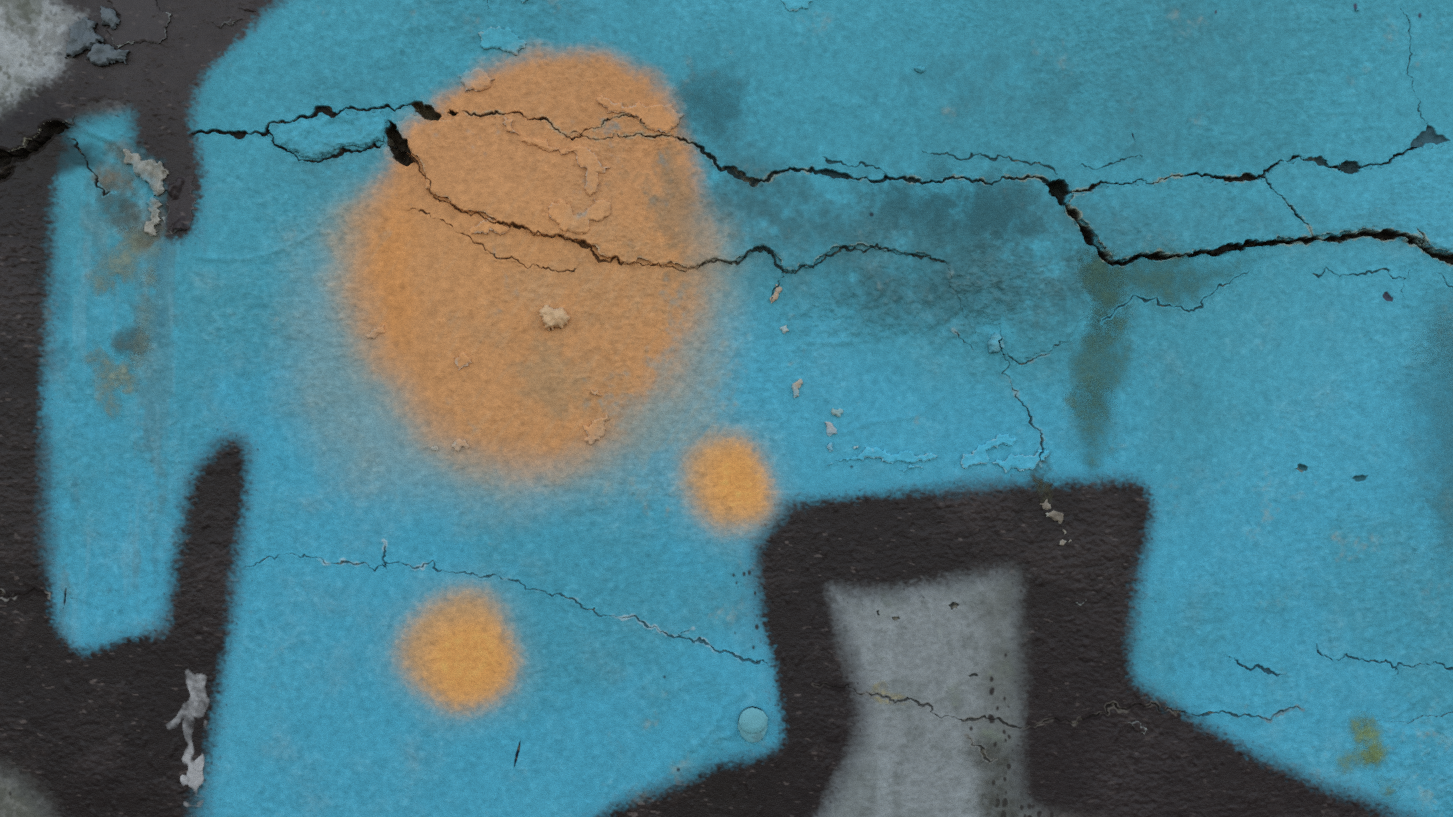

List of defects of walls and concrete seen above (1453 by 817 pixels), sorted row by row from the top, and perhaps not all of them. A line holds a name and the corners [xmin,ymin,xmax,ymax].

peeling [64,0,172,67]
peeling [459,68,495,92]
peeling [597,95,684,133]
crack [0,118,118,199]
spalling [123,149,197,236]
peeling [503,116,611,235]
crack [188,101,953,306]
crack [458,3,1453,469]
peeling [825,408,938,472]
peeling [960,433,1050,473]
crack [240,538,773,668]
crack [810,641,1453,766]